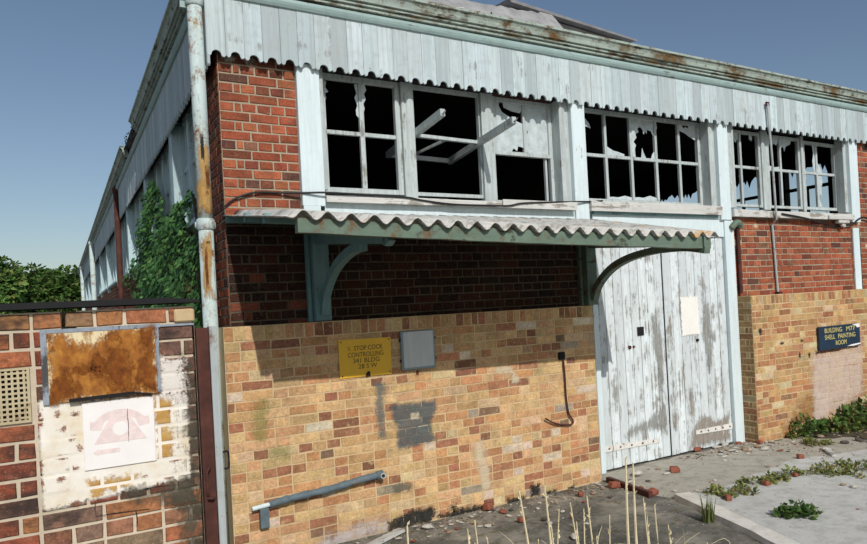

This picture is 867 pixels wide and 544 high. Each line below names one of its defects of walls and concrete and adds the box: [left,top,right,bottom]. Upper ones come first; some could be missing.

corrosion [196,135,212,214]
corrosion [202,233,213,297]
corrosion [46,325,158,406]
peeling [38,356,191,511]
water stain [376,383,385,437]
peeling [627,304,730,453]